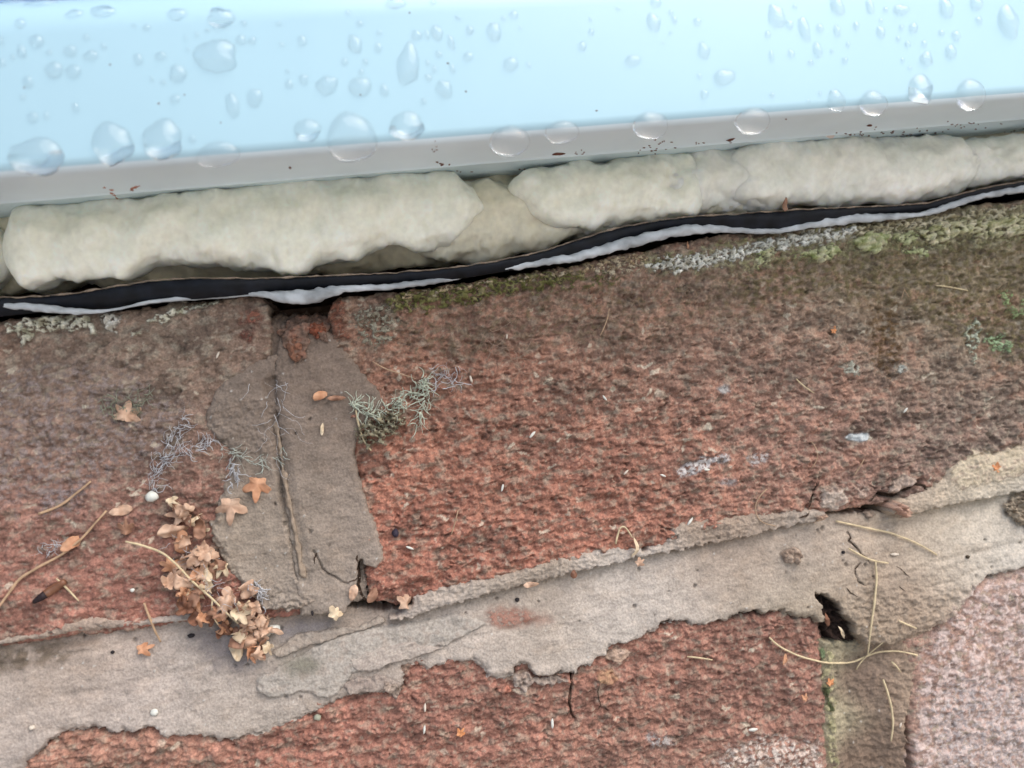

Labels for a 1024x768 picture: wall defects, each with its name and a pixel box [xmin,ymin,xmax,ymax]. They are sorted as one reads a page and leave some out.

spalling [277,300,351,362]
spalling [849,484,913,519]
spalling [1003,491,1024,526]
spalling [780,547,804,565]
spalling [815,594,855,642]
peeling [255,611,486,699]
spalling [497,672,568,694]
crack [566,673,574,716]
spalling [597,648,631,685]